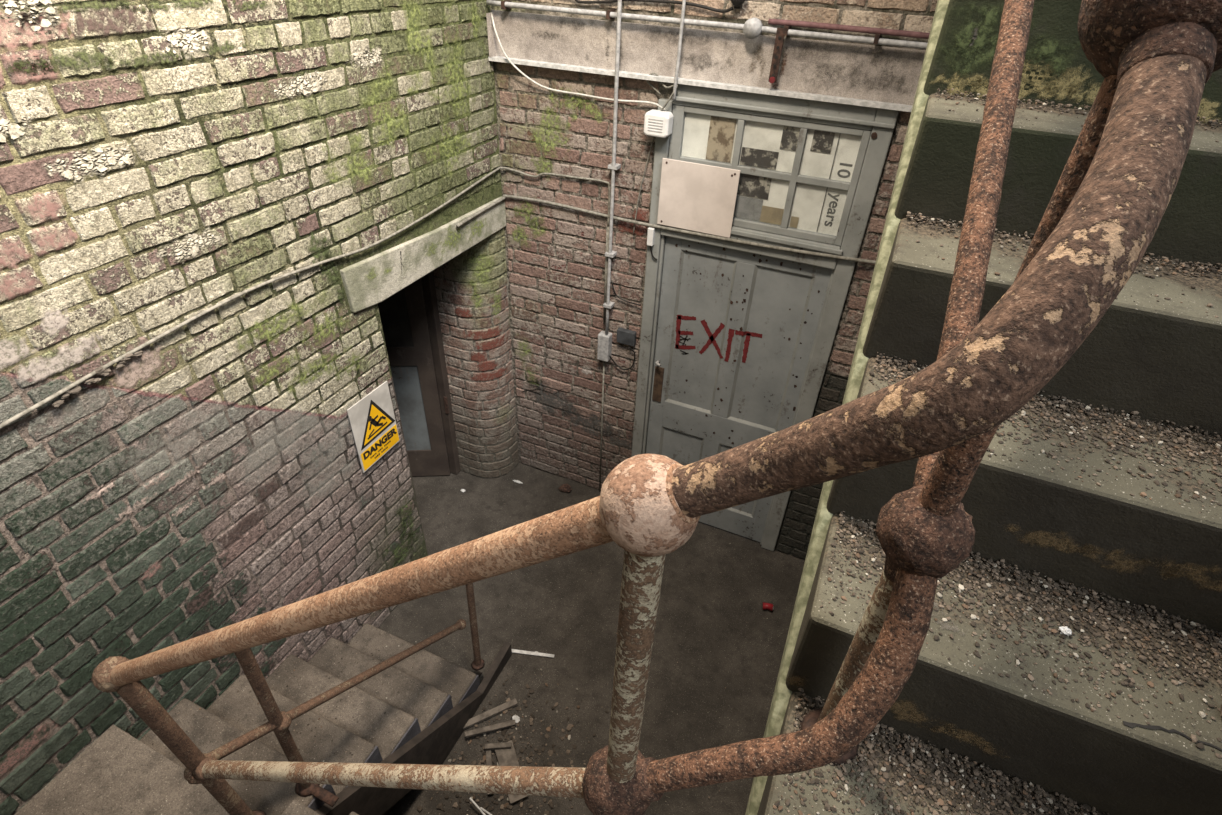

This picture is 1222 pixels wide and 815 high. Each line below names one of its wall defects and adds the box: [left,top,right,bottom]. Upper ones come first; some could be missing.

leakage [367,68,409,147]
leakage [404,4,471,174]
leakage [532,93,602,173]
leakage [240,232,360,392]
corrosion [1009,526,1149,572]